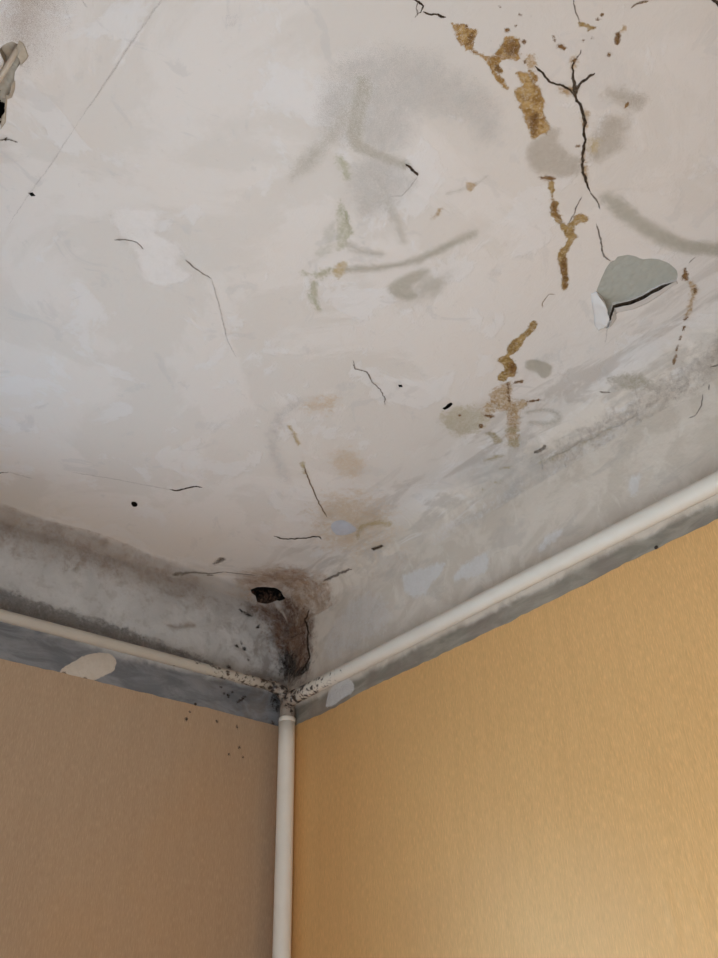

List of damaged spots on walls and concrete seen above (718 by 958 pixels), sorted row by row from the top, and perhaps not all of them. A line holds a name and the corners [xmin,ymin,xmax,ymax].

crack [415,0,446,18]
crack [535,51,610,261]
water stain [0,505,336,689]